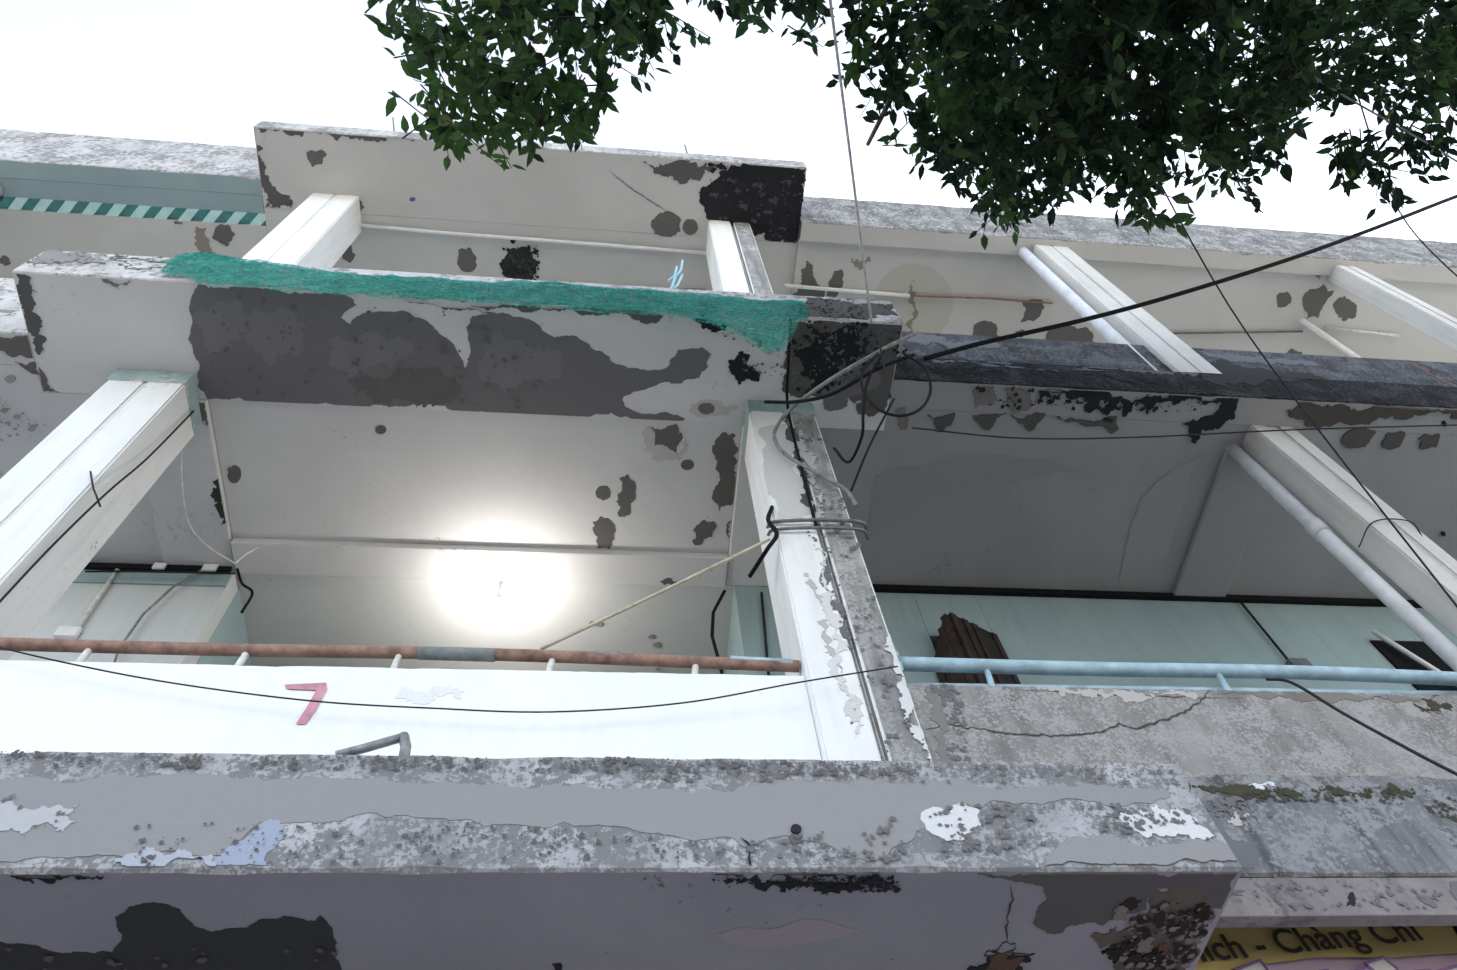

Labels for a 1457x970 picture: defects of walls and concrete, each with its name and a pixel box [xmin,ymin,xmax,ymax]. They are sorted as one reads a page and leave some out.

peeling [212,296,663,409]
spalling [199,381,226,429]
spalling [698,403,715,414]
spalling [928,413,955,430]
spalling [973,385,1119,434]
peeling [884,634,932,761]
crack [924,690,1237,737]
peeling [0,794,79,837]
peeling [920,801,1055,856]
peeling [1079,802,1214,841]
spalling [1091,885,1216,970]
spalling [967,942,1035,970]